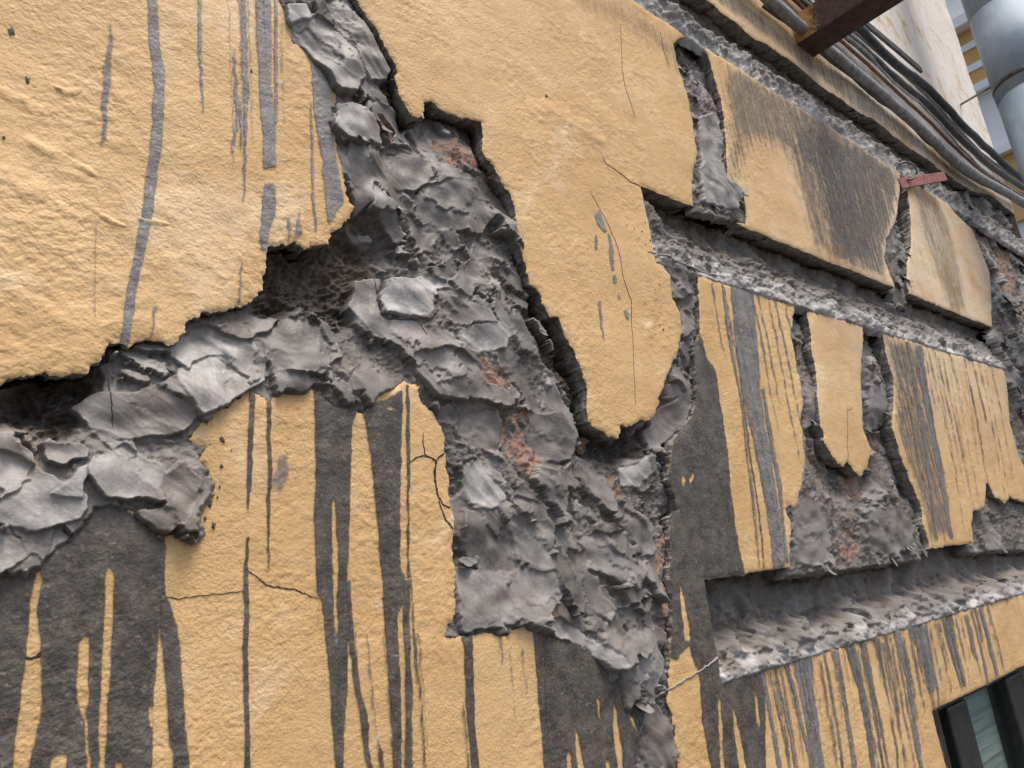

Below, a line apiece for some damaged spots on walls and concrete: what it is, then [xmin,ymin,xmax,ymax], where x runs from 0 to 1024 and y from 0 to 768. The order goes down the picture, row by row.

damp [0,507,190,768]
damp [120,0,165,346]
crack [166,571,318,600]
damp [242,537,251,768]
flaking render [0,0,697,768]
damp [314,385,430,768]
crack [407,433,453,530]
damp [462,634,480,768]
damp [711,283,807,570]
damp [667,334,1010,768]
flaking render [879,216,913,313]
flaking render [948,190,1024,466]